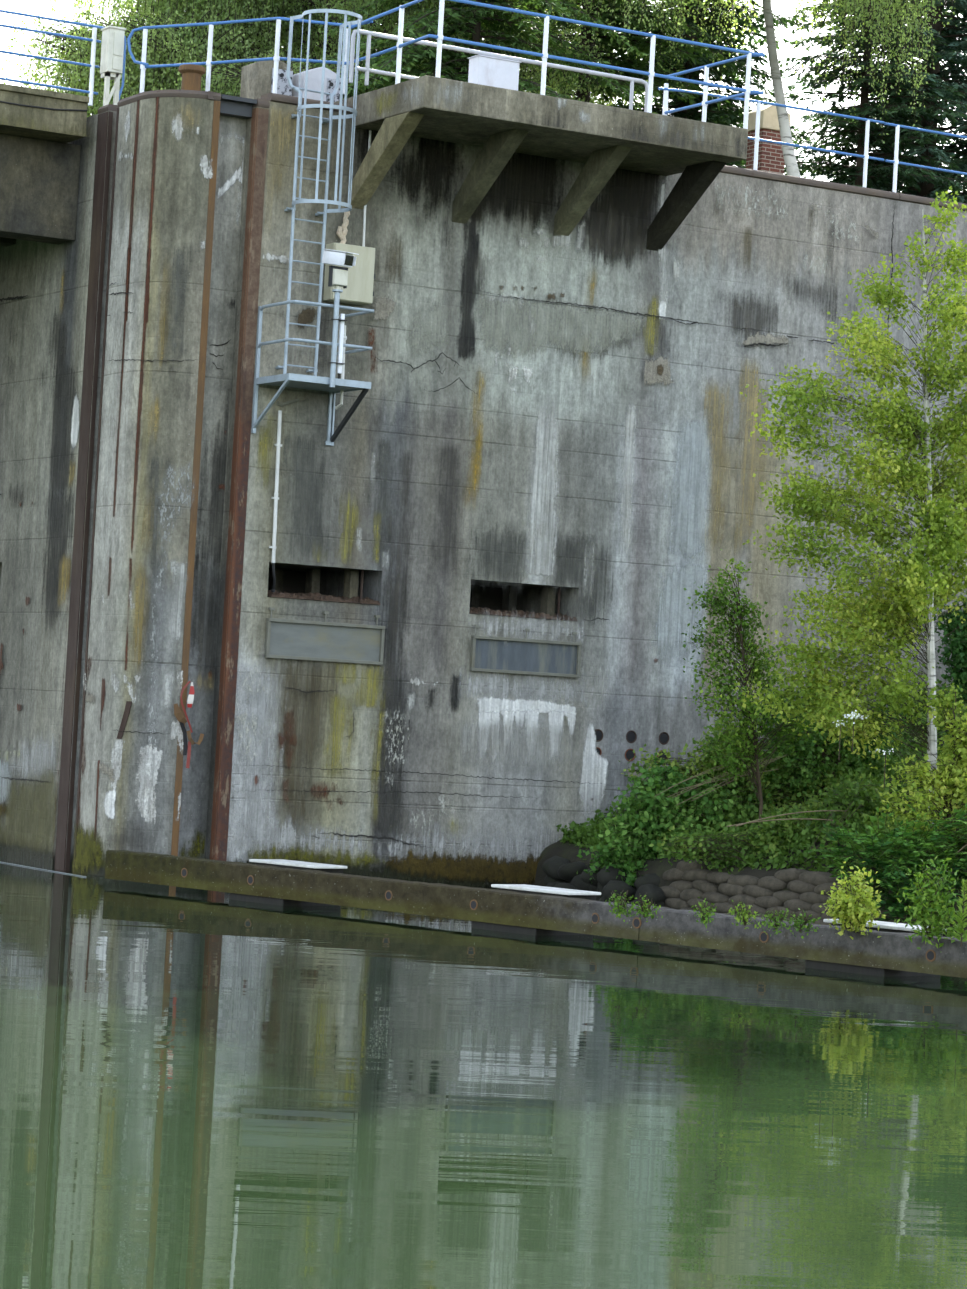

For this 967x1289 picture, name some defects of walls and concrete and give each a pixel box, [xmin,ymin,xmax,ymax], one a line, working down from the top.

water stain [354,129,378,163]
water stain [391,138,463,211]
water stain [458,152,680,359]
crack [376,352,477,394]